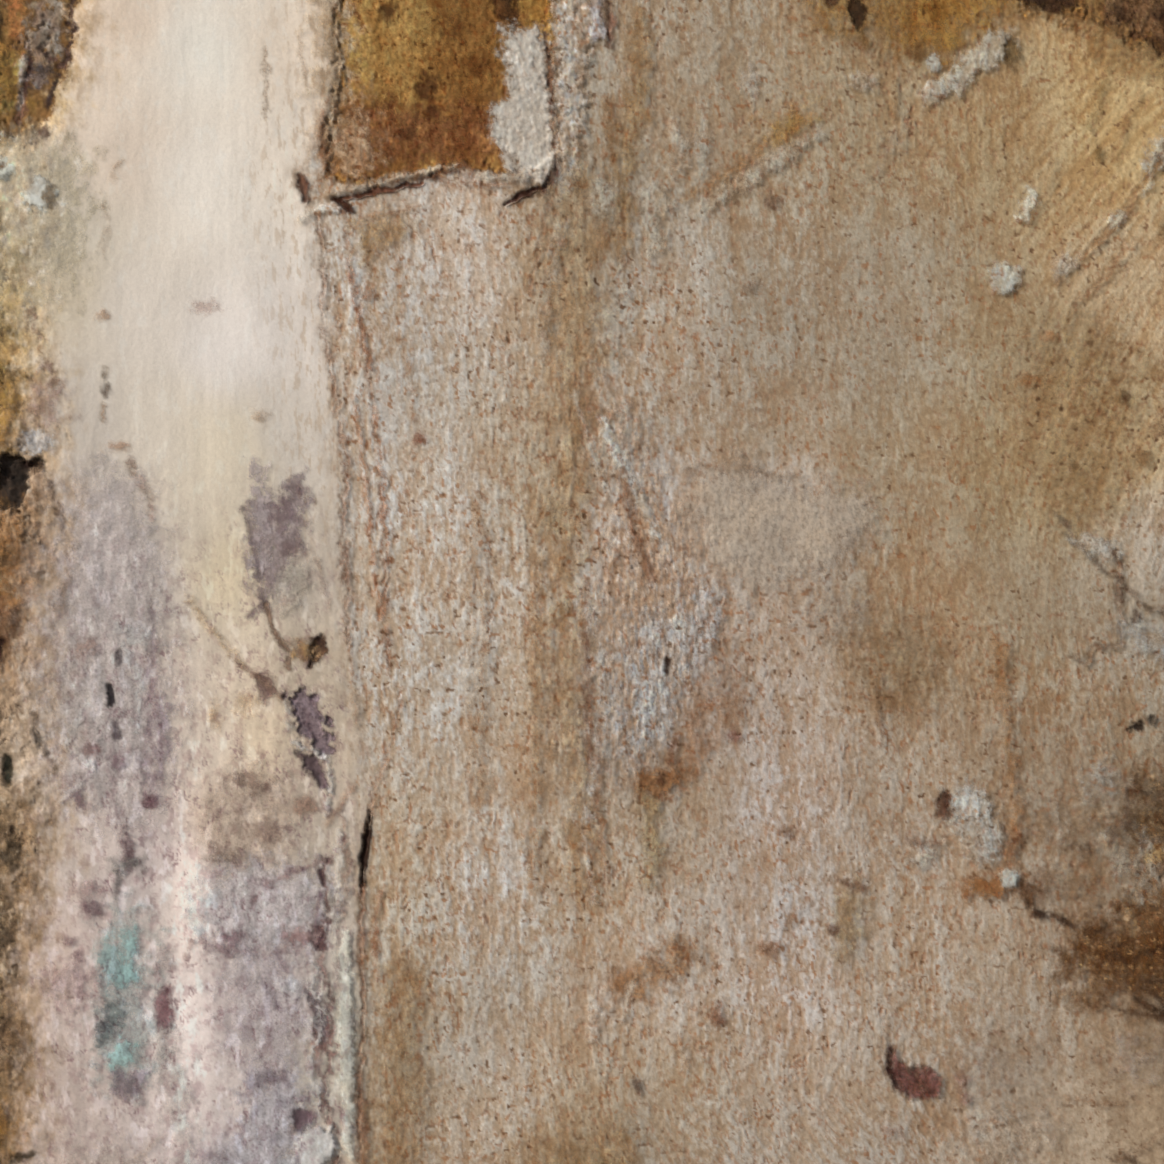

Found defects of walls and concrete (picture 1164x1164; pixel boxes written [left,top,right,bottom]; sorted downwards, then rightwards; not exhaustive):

spalling [307,0,565,189]
crack [297,2,559,715]
peeling [0,430,190,828]
water stain [43,825,174,1101]
water stain [205,771,290,870]
water stain [199,946,314,1164]
crack [356,703,402,1164]
peeling [936,776,1013,865]
crack [1020,860,1107,928]
spalling [1127,715,1157,731]